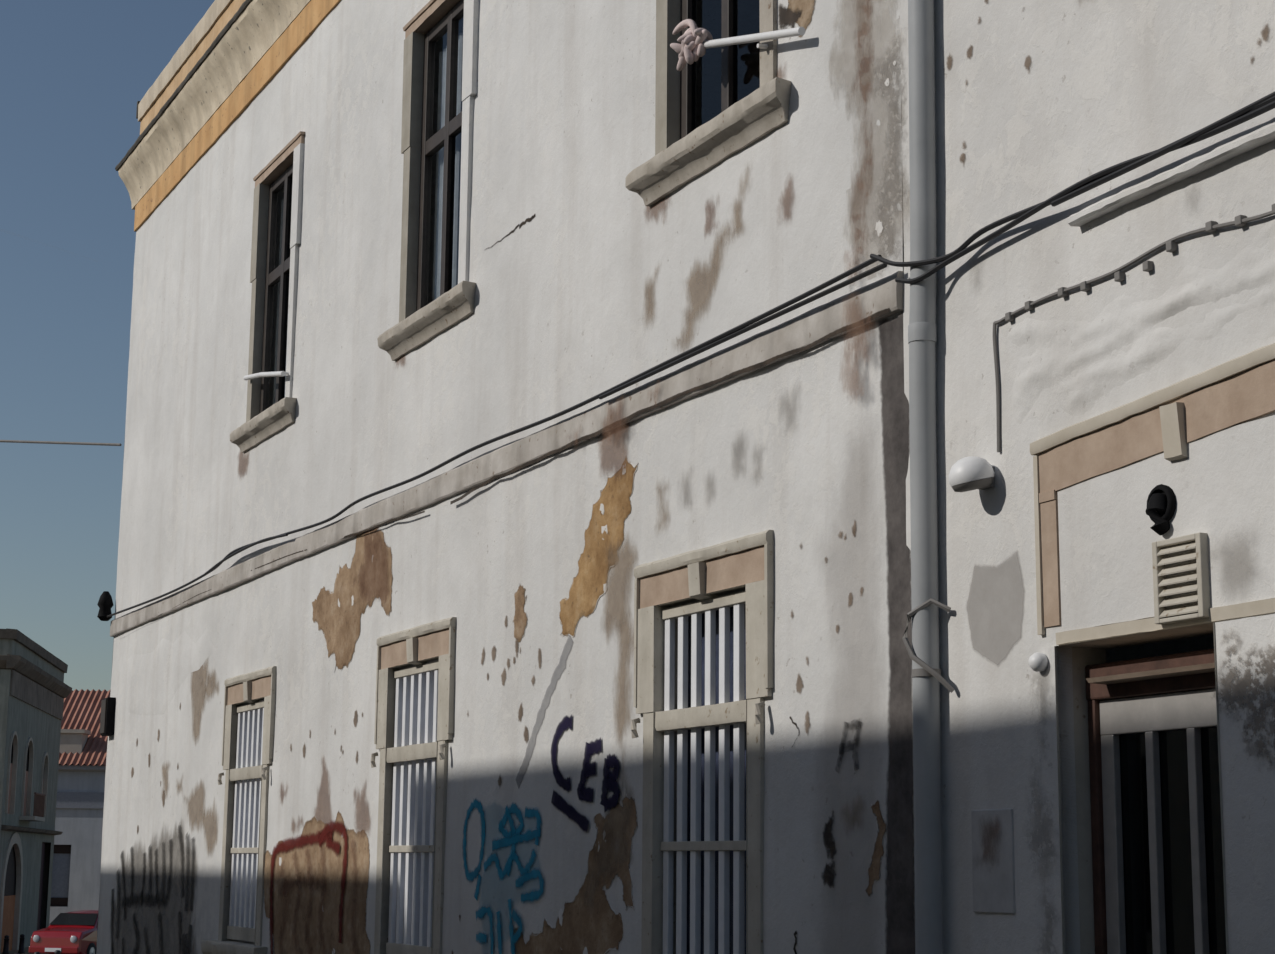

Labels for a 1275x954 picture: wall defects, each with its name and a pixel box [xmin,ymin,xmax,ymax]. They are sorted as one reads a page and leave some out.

flaking render [778,0,816,37]
crack [486,214,535,249]
flaking render [312,528,393,673]
flaking render [481,583,528,685]
flaking render [559,425,638,637]
flaking render [518,704,529,742]
flaking render [264,810,370,954]
flaking render [513,794,638,954]